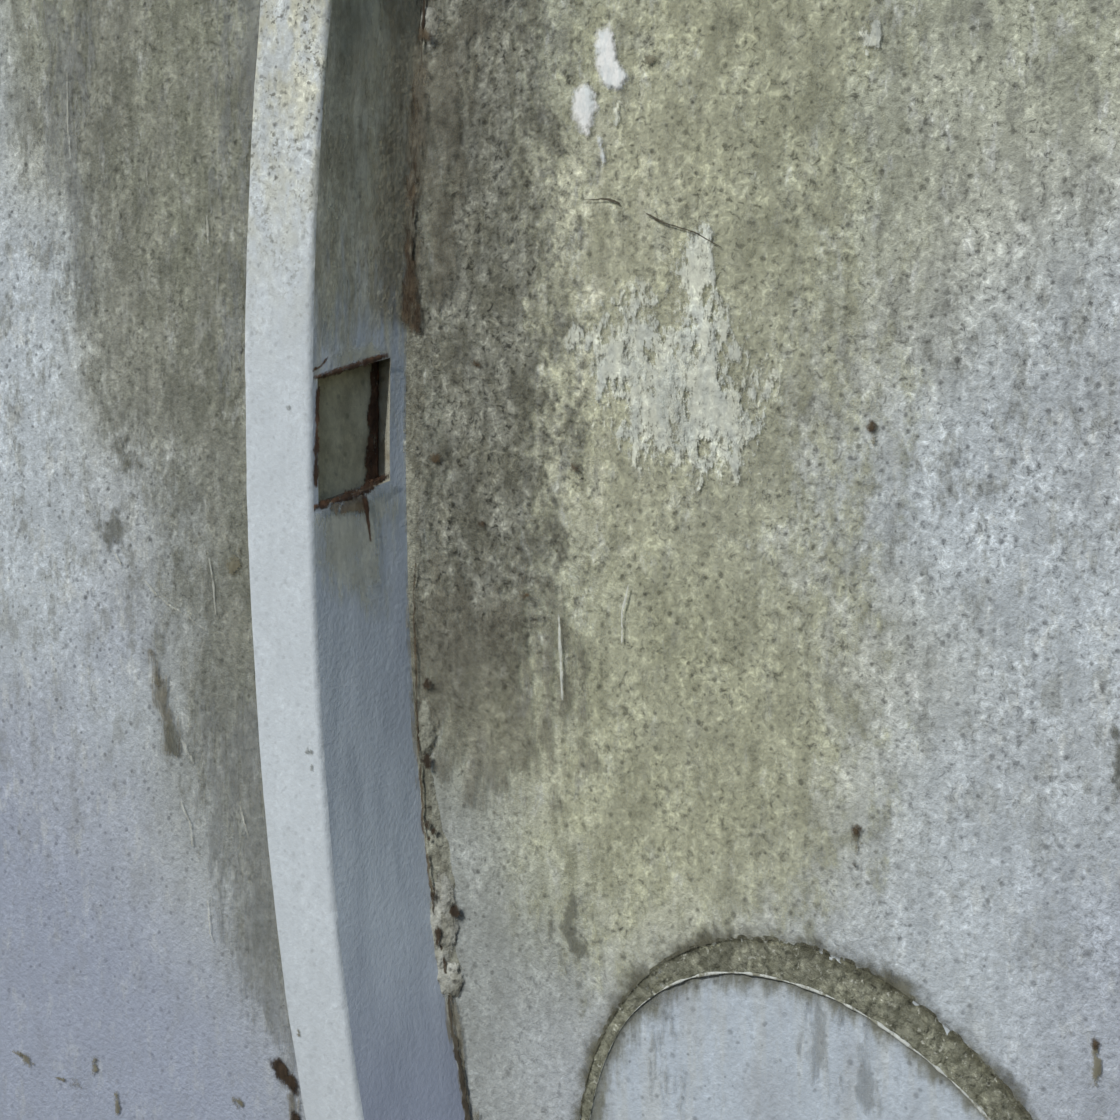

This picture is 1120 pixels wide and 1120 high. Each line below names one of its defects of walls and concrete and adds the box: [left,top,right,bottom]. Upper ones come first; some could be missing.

peeling [859,20,881,55]
corrosion [401,0,431,333]
corrosion [313,353,389,541]
spalling [403,0,781,710]
spalling [420,753,432,769]
corrosion [270,1057,299,1120]